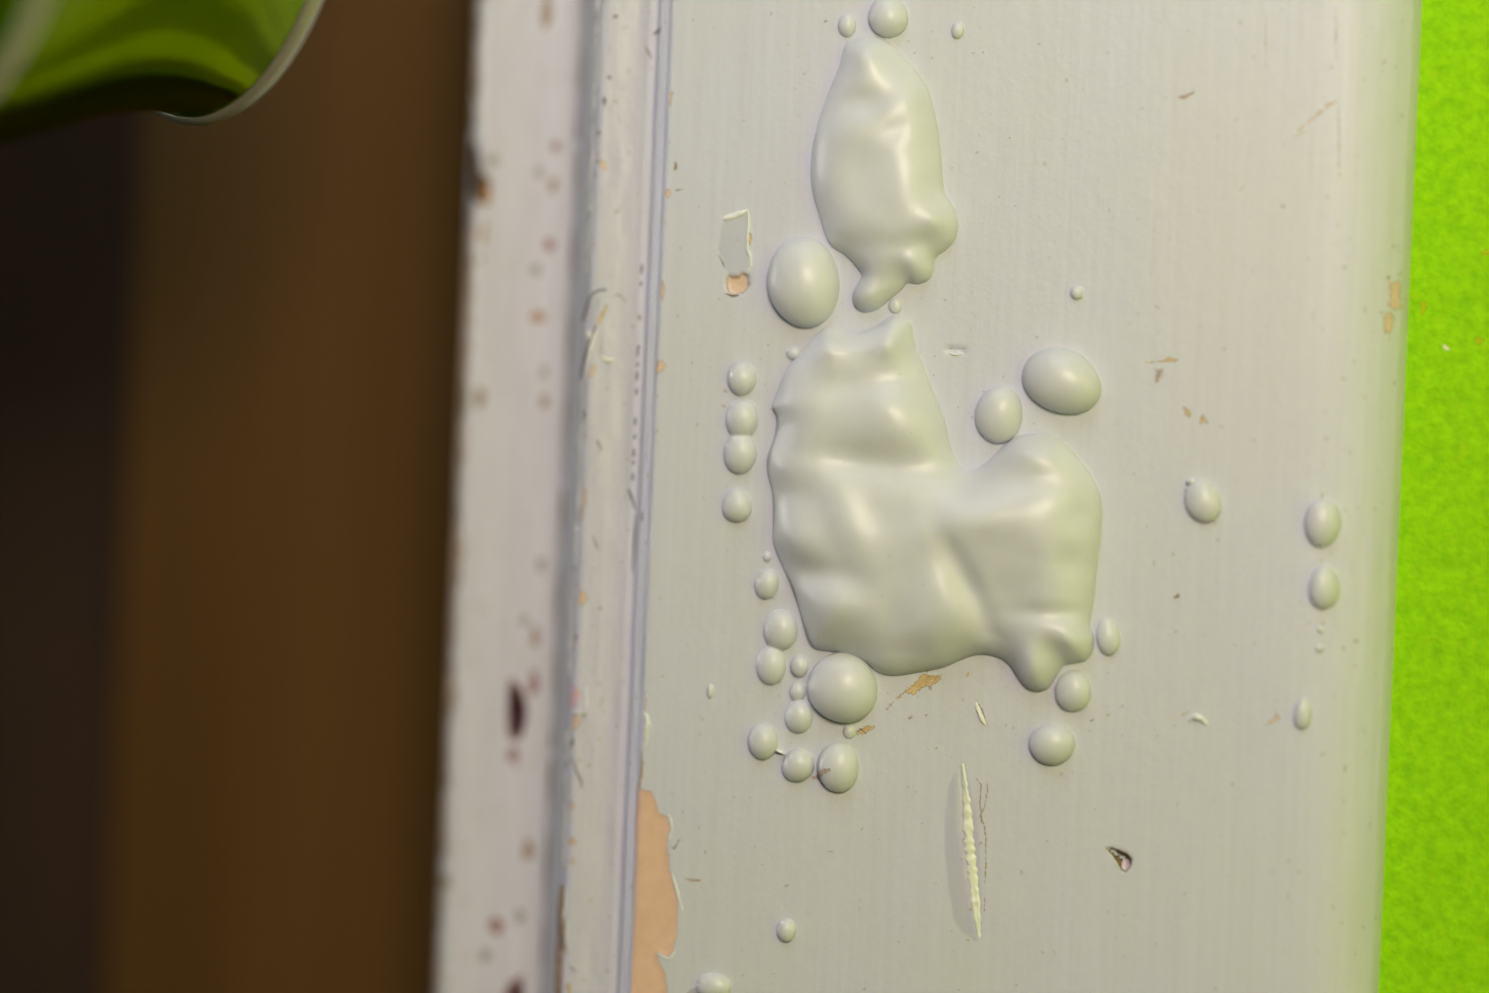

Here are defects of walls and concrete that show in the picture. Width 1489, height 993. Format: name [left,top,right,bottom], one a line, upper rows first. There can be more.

peeling [720,209,752,297]
peeling [631,698,683,993]